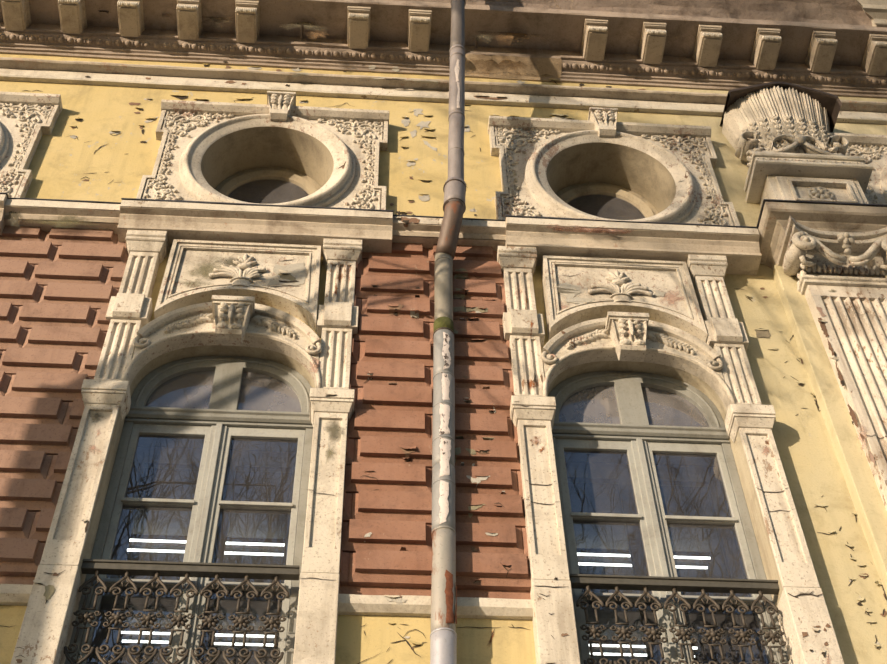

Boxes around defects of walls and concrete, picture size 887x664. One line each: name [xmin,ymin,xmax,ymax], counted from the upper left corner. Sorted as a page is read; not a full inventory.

peeling [129,98,158,143]
peeling [401,109,437,151]
spalling [390,194,430,227]
spalling [755,328,771,338]
peeling [439,332,495,524]
peeling [845,542,869,586]
corrosion [445,570,457,624]
peeling [856,593,887,625]
crack [358,623,426,664]